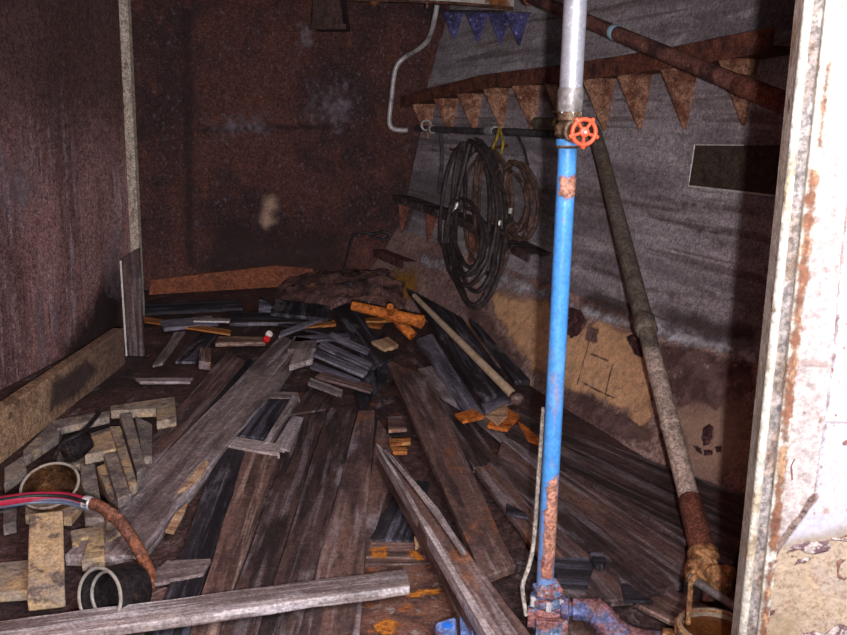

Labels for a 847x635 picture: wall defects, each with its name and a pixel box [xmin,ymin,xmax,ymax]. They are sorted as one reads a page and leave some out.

rust [818,63,831,147]
damp [262,199,274,226]
rust [760,169,820,635]
peeling [788,538,847,566]
spalling [801,624,847,635]